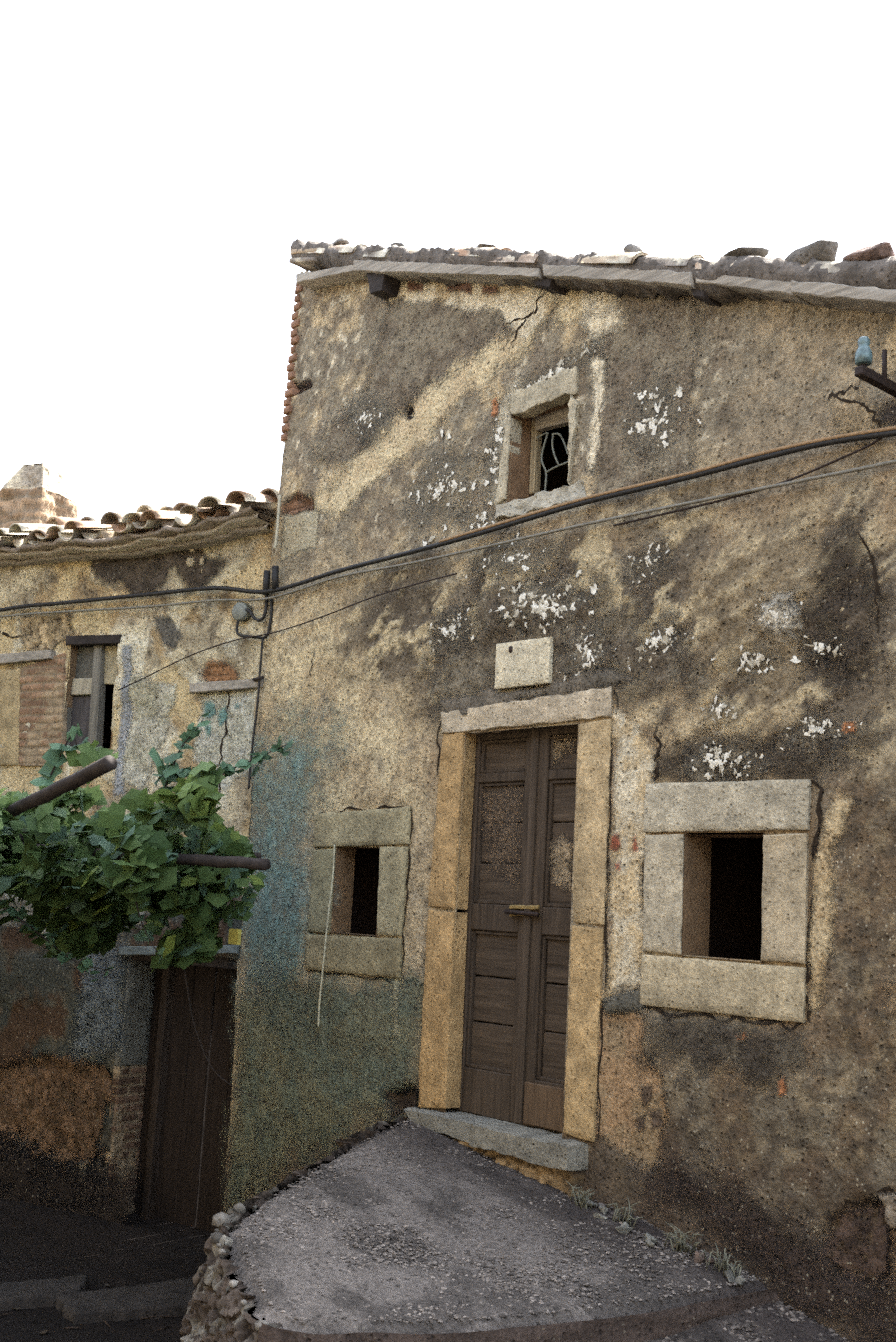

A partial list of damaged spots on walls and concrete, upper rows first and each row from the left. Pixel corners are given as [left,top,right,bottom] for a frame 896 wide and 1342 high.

crack [506,296,542,348]
crack [827,379,861,401]
peeling [389,281,622,546]
peeling [623,382,683,448]
peeling [483,532,694,681]
peeling [755,598,803,624]
peeling [790,635,844,664]
peeling [701,695,737,722]
peeling [780,717,862,751]
peeling [691,741,763,780]
spalling [824,1195,896,1284]